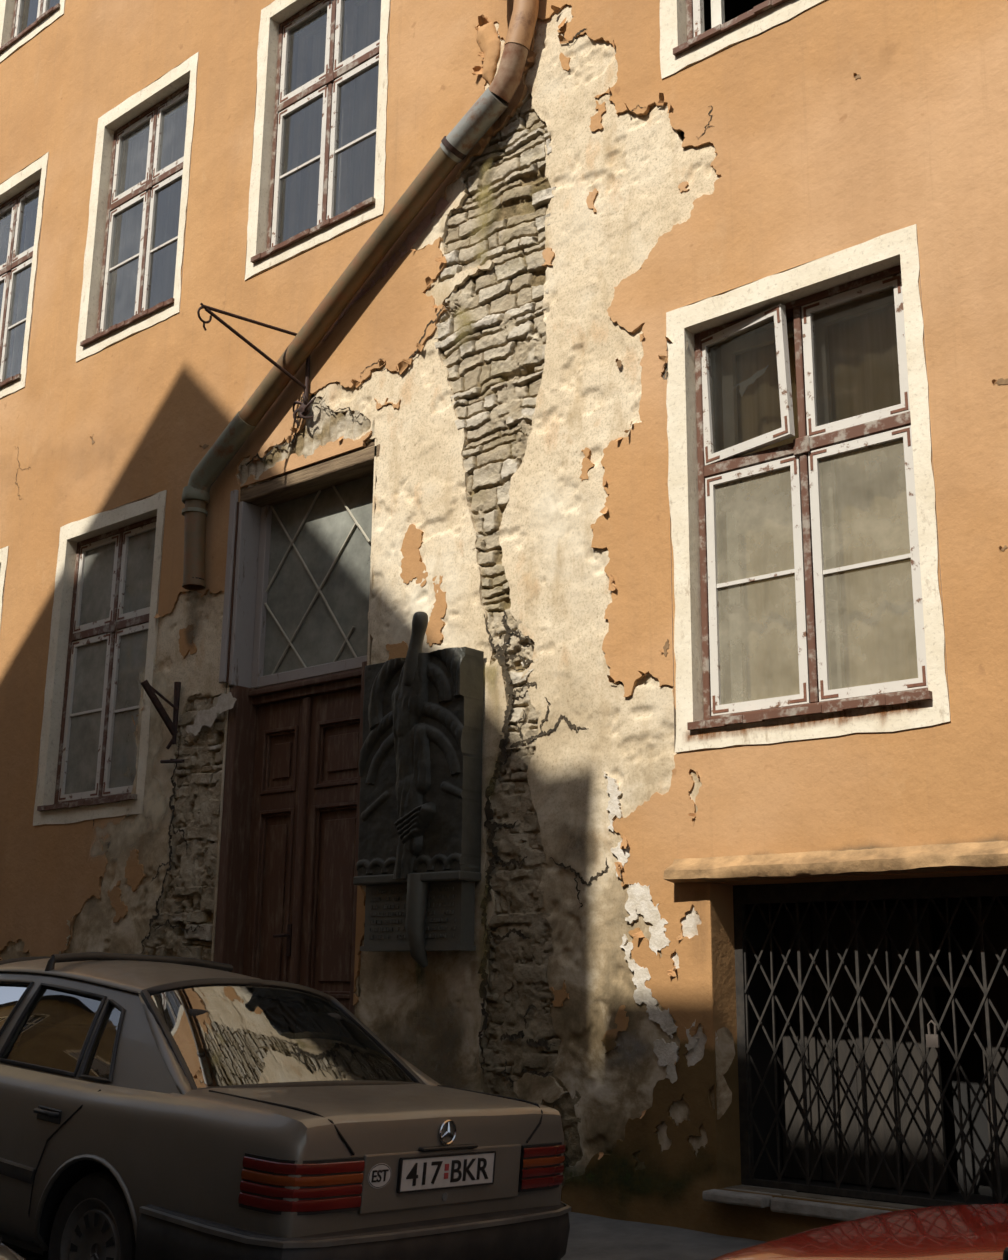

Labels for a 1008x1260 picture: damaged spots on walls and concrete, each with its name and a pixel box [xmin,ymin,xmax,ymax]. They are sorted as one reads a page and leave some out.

peeling [59,588,237,961]
peeling [237,5,735,1172]
crack [478,610,608,1108]